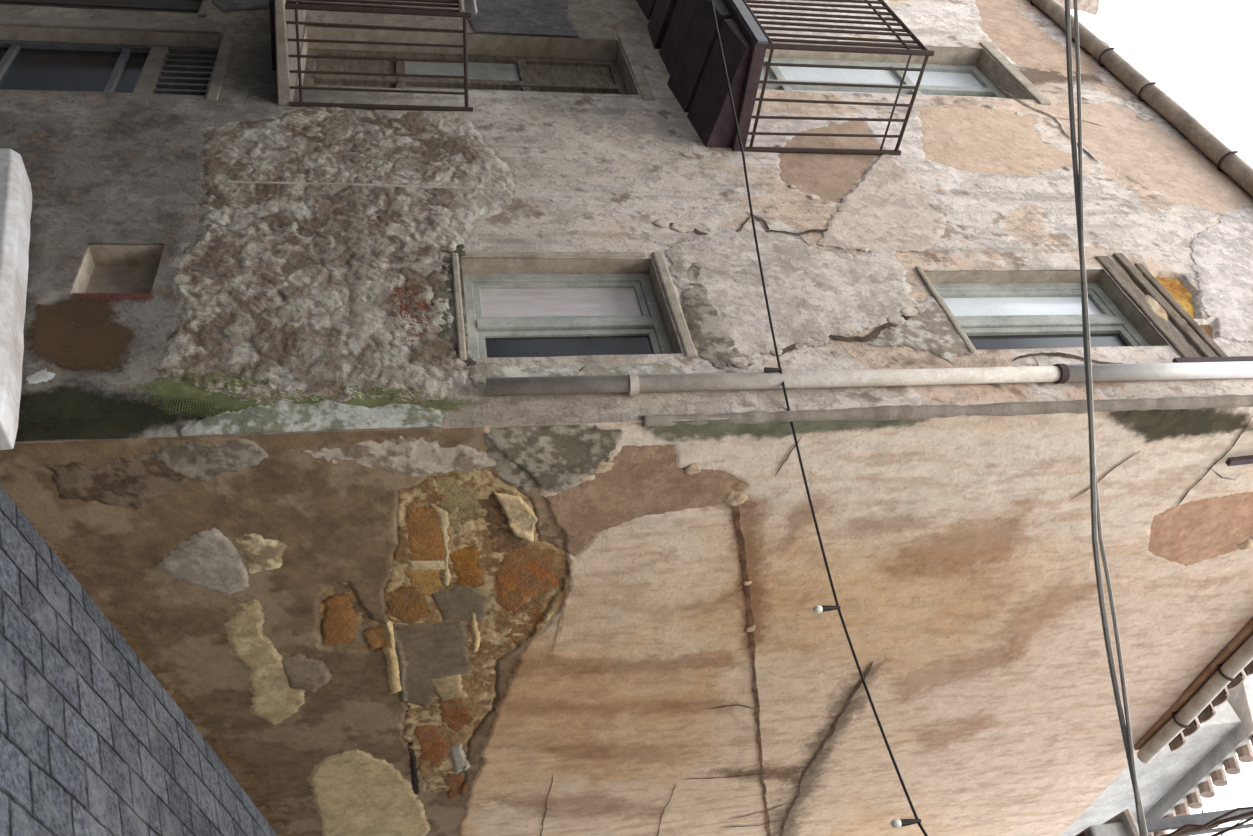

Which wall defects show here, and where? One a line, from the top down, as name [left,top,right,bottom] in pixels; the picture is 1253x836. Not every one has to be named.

crack [997,85,1104,162]
crack [654,212,828,246]
flaking render [666,121,951,368]
peeling [917,101,1253,343]
crack [779,306,919,356]
water stain [180,400,450,437]
crack [775,436,802,476]
crack [1175,417,1252,507]
peeling [1148,492,1253,567]
flaking render [0,427,749,836]
crack [656,500,873,836]